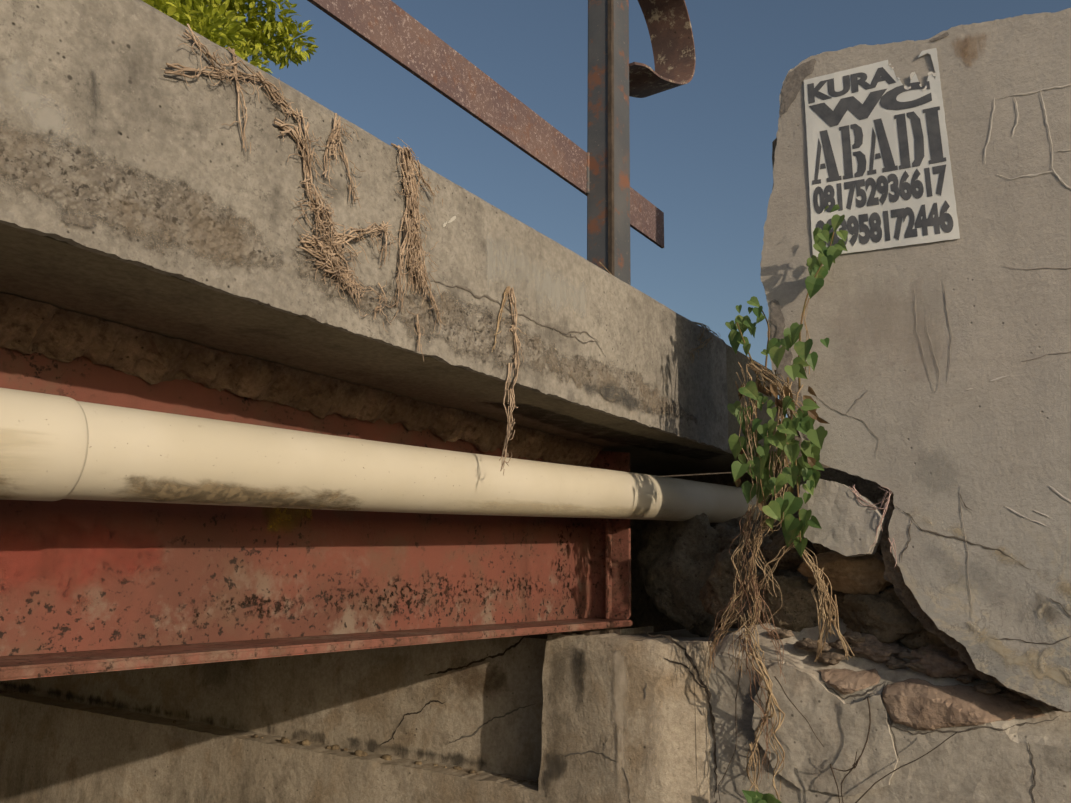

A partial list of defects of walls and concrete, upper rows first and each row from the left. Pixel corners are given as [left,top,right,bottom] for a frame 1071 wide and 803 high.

crack [984,83,1071,189]
crack [436,281,606,357]
corrosion [226,594,288,618]
corrosion [325,575,544,613]
crack [381,635,536,745]
crack [551,737,630,803]
crack [641,630,718,803]
flaking render [818,669,1045,731]
crack [815,670,1058,803]